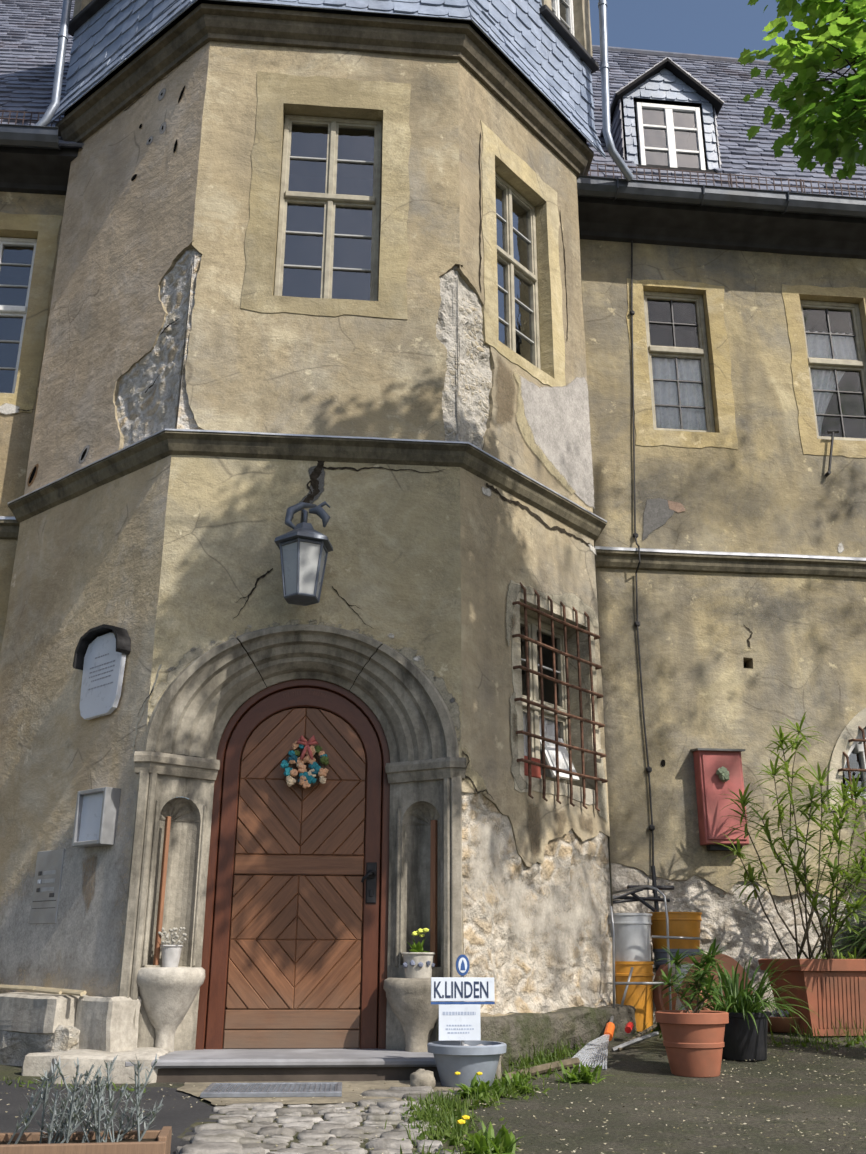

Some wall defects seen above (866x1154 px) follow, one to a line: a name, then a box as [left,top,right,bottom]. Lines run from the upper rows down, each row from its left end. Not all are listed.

spalling [115,249,202,448]
spalling [435,266,492,449]
crack [297,460,445,511]
crack [482,483,596,554]
crack [232,568,273,620]
spalling [148,629,250,717]
flaking render [388,634,866,1015]